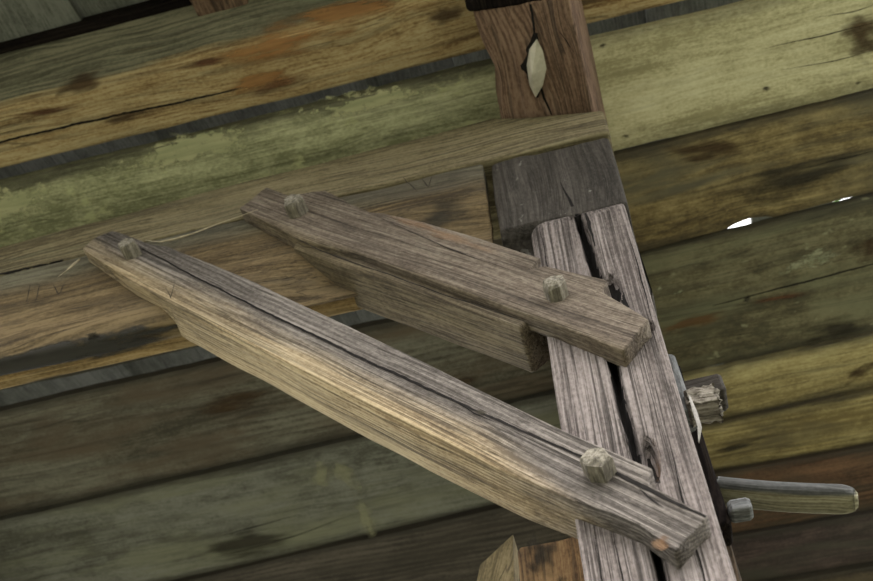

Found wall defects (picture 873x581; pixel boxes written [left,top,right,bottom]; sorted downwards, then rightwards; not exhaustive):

crack [528,4,536,39]
crack [772,5,872,47]
leakage [58,73,97,94]
crack [0,87,241,144]
crack [540,88,552,115]
leakage [427,200,459,227]
crack [560,182,602,279]
crack [713,263,873,306]
leakage [0,324,178,376]
crack [142,248,582,457]
crack [607,361,706,517]
crack [652,552,666,581]